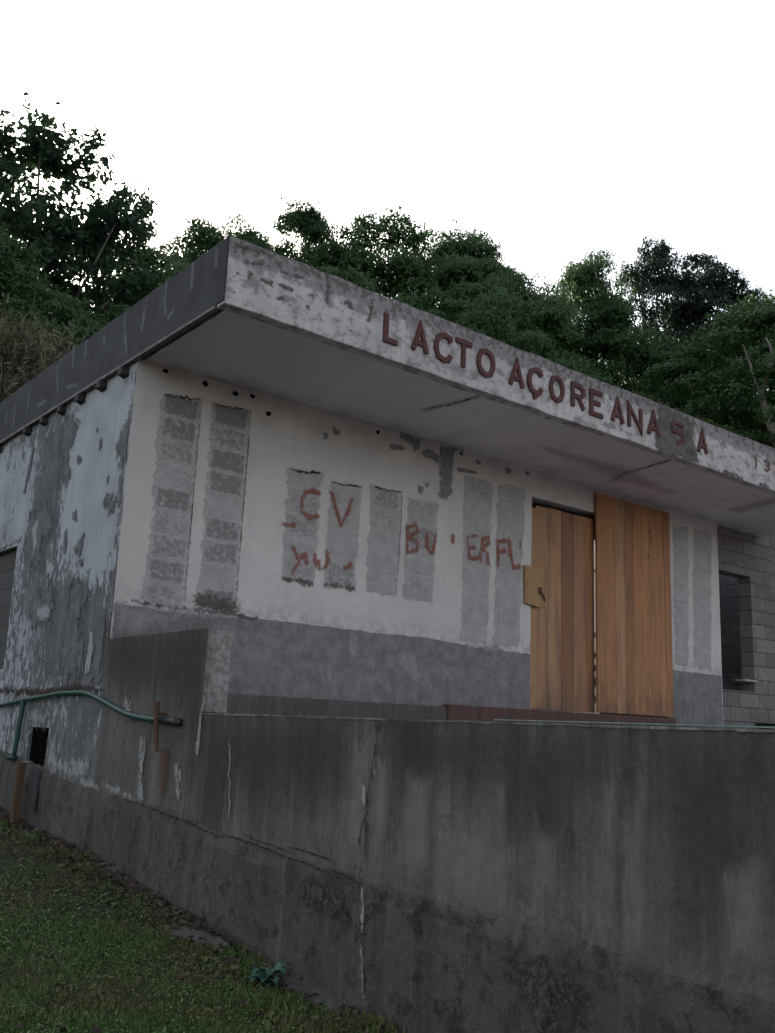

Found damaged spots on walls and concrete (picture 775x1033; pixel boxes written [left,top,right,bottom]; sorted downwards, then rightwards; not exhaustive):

peeling [56,407,82,490]
peeling [103,404,132,549]
peeling [0,437,95,691]
peeling [132,592,258,621]
peeling [282,575,355,592]
crack [114,722,383,998]